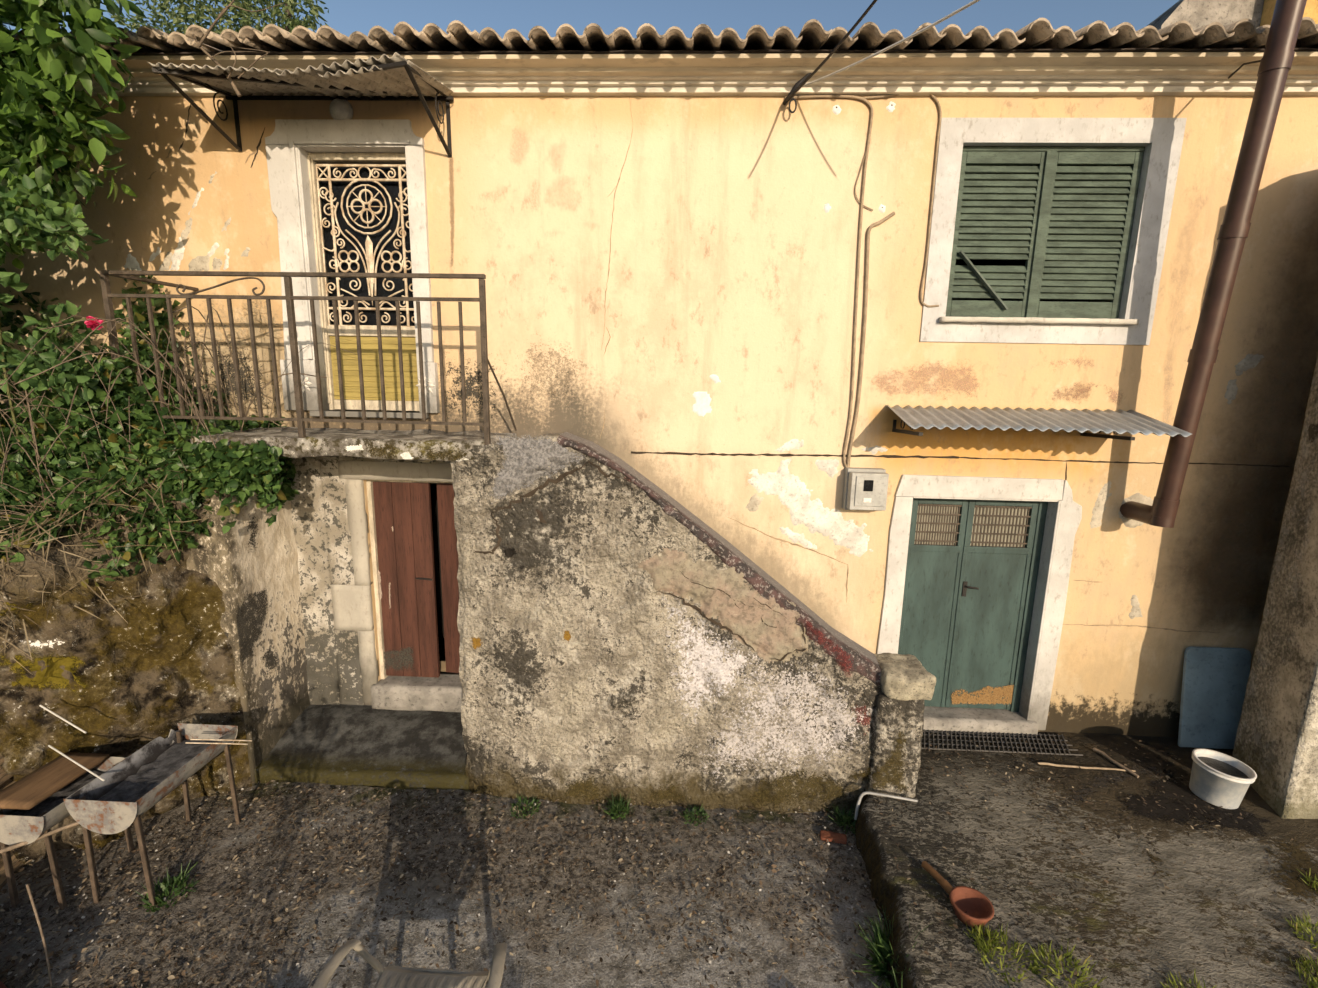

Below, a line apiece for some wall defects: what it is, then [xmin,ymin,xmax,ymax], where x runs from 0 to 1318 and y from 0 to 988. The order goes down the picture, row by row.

crack [147,104,191,180]
peeling [124,171,251,271]
crack [601,97,633,356]
peeling [692,374,721,417]
peeling [745,439,873,557]
peeling [861,445,888,454]
peeling [656,595,873,782]